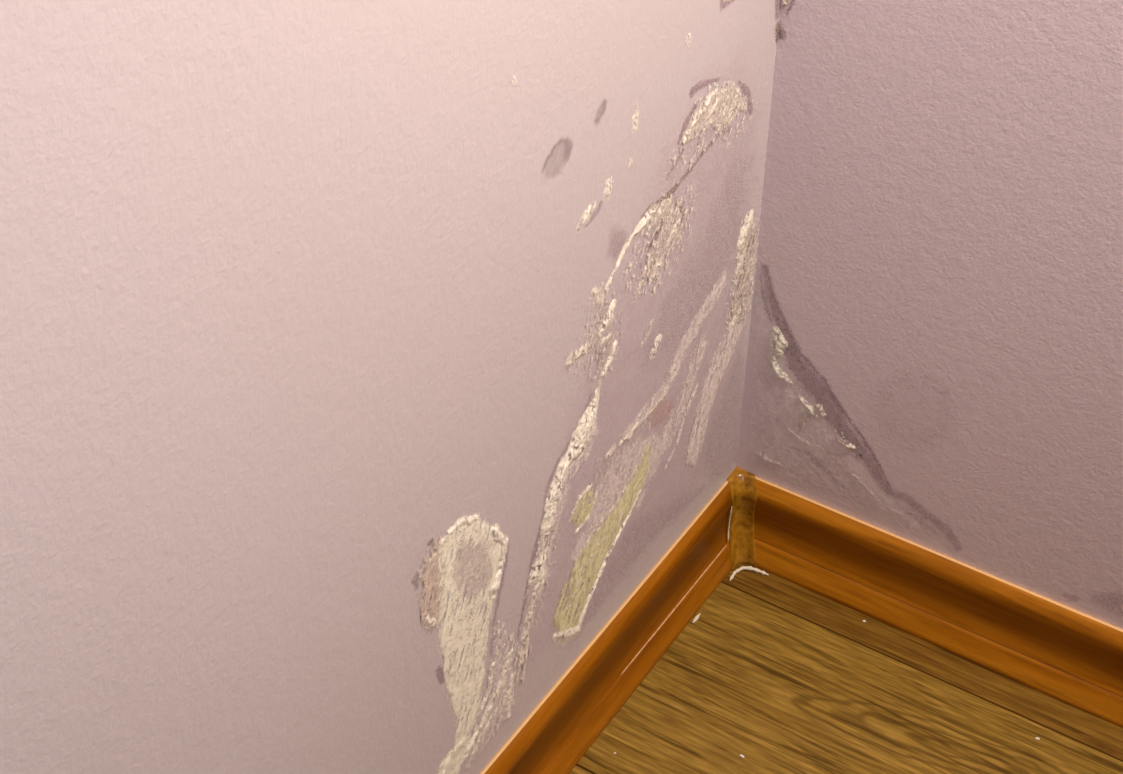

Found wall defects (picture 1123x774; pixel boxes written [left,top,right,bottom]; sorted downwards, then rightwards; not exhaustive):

peeling [775,0,795,43]
spalling [413,74,963,774]